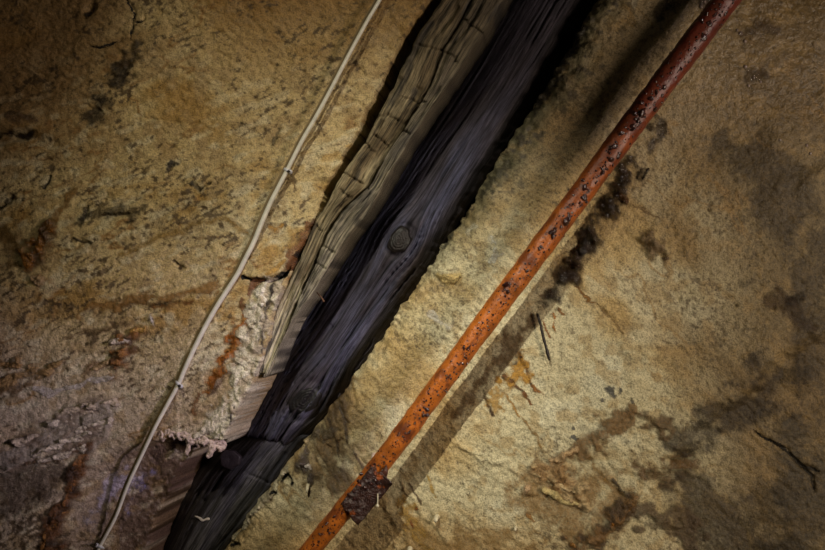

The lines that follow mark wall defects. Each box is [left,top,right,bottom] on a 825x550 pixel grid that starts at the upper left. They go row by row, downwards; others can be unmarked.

crack [92,0,146,49]
corrosion [77,280,219,380]
flaking render [193,277,284,442]
corrosion [191,219,316,415]
leakage [632,237,825,550]
leakage [506,446,622,542]